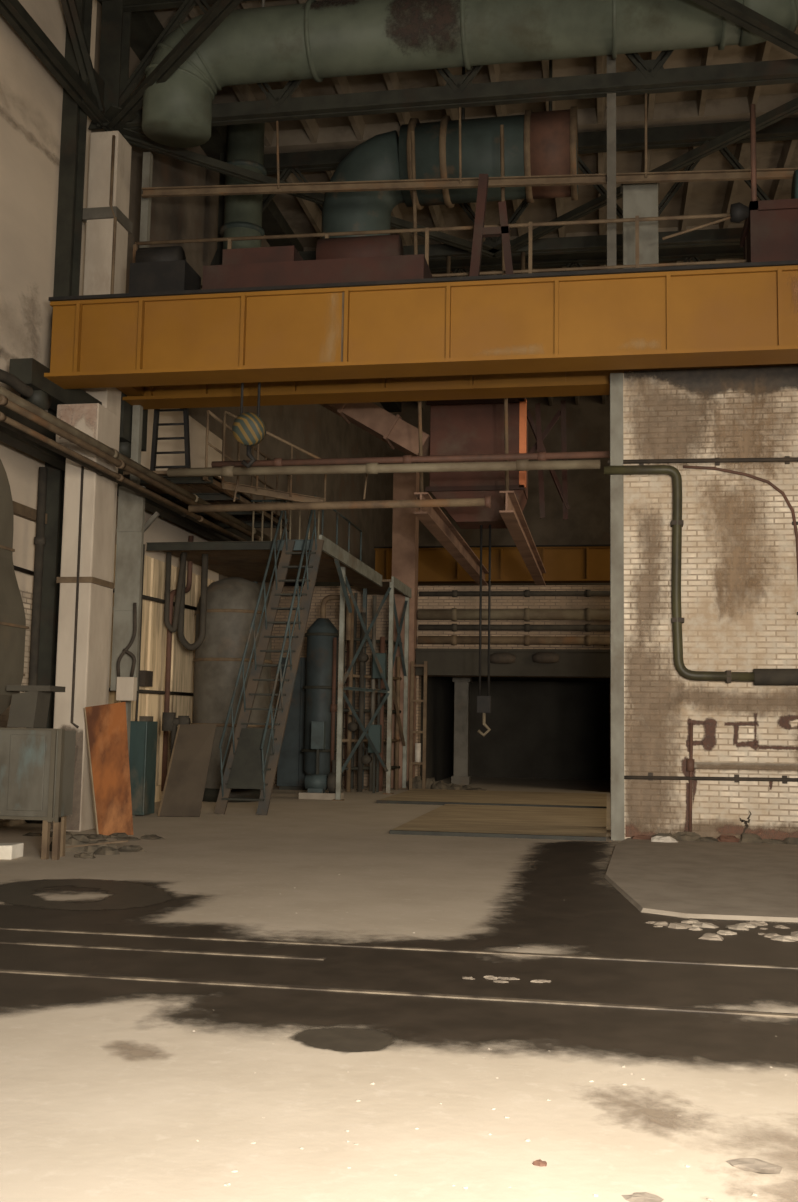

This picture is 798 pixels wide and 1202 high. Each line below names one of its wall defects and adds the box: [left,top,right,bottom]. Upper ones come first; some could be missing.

leakage [634,382,790,472]
leakage [710,486,766,612]
corrosion [681,713,798,832]
leakage [0,841,798,1068]